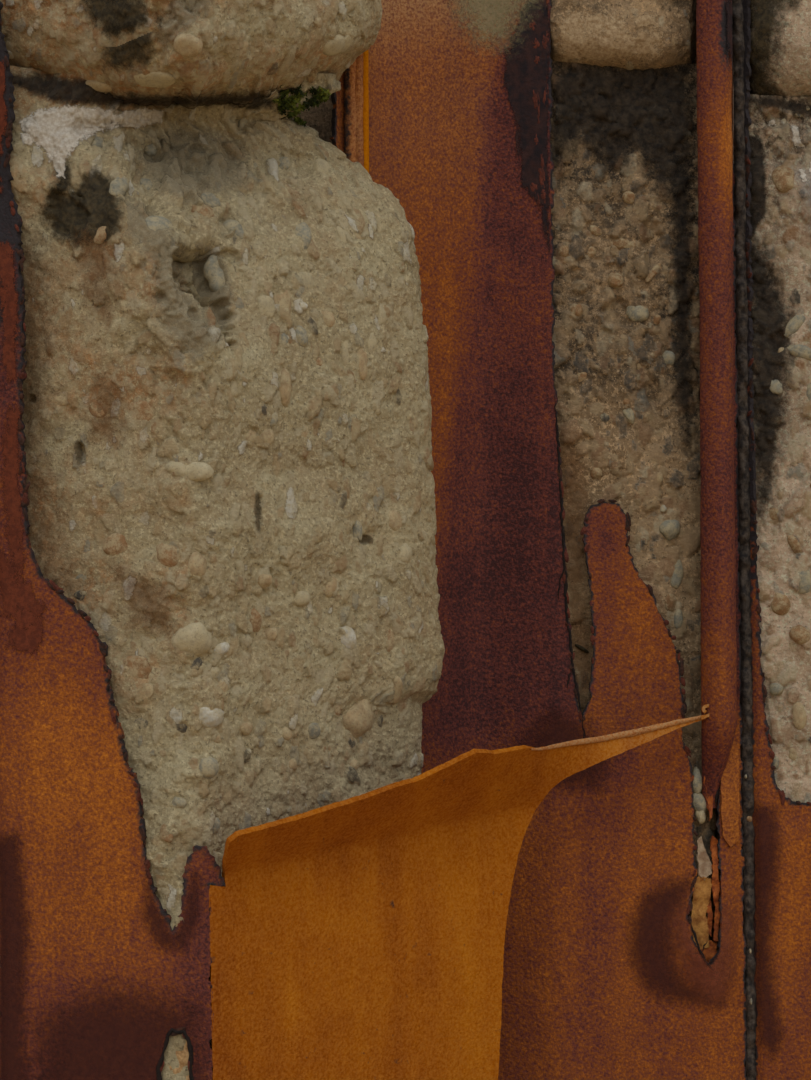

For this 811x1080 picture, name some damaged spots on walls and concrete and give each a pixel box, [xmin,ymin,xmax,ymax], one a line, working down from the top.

leakage [80,0,152,69]
leakage [550,62,694,443]
spalling [74,440,83,464]
rust [531,713,588,748]
rust [563,761,603,785]
rust [691,741,740,963]
rust [146,879,197,947]